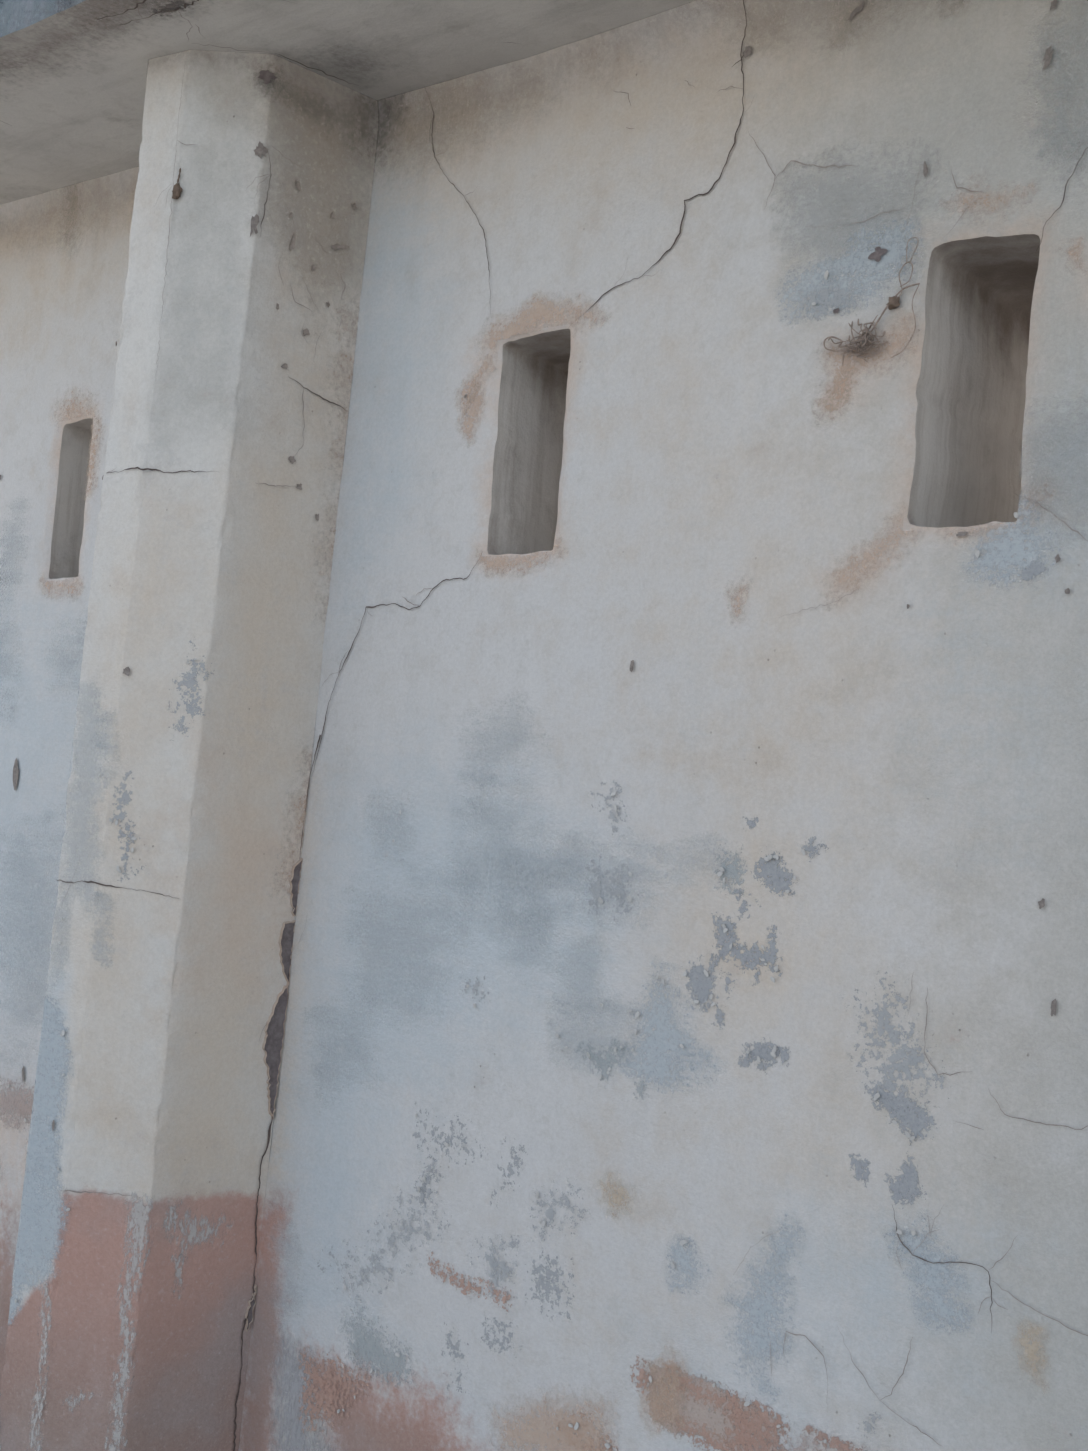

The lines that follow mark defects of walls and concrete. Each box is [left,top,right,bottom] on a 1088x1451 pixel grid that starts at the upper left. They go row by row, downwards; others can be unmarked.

crack [425,90,491,313]
crack [572,0,853,324]
crack [246,146,347,487]
crack [107,466,217,474]
crack [56,863,179,907]
crack [233,558,480,1451]
peeling [682,849,798,1027]
peeling [738,1037,790,1076]
peeling [846,972,945,1205]
crack [892,1204,1088,1336]
peeling [30,1283,51,1451]